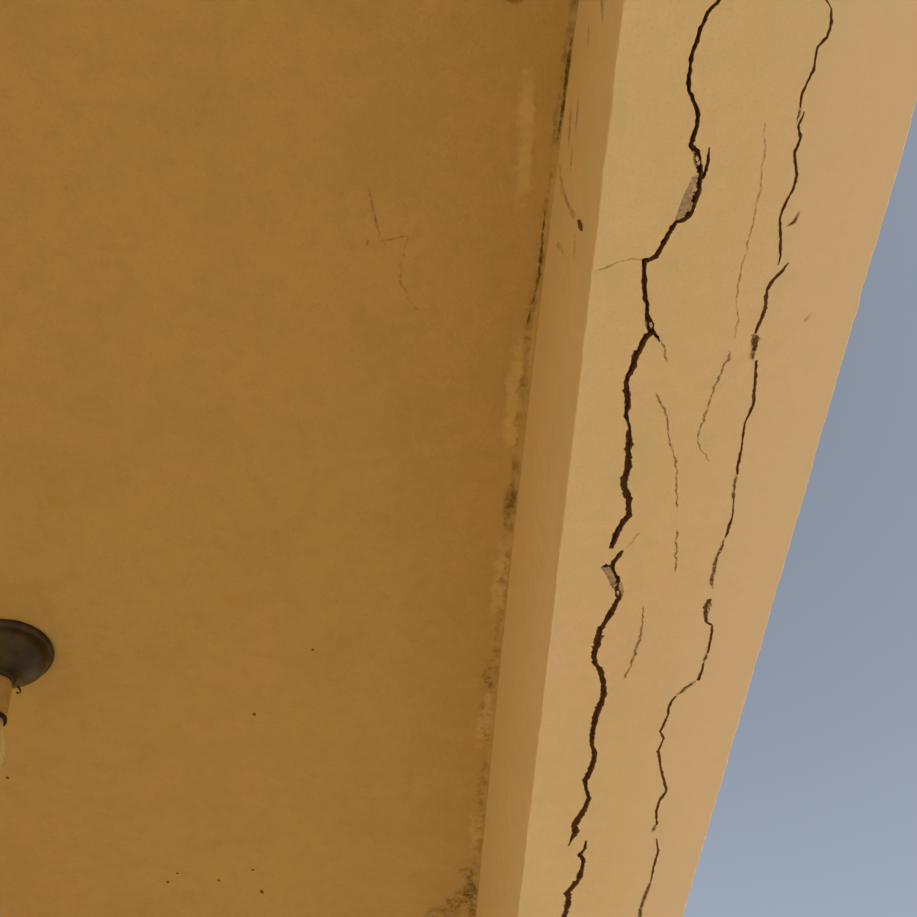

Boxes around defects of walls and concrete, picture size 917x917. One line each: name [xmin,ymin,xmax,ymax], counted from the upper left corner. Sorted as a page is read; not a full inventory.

crack [558,41,572,131]
spalling [675,151,700,220]
crack [528,215,545,321]
crack [561,0,721,917]
crack [638,0,833,917]